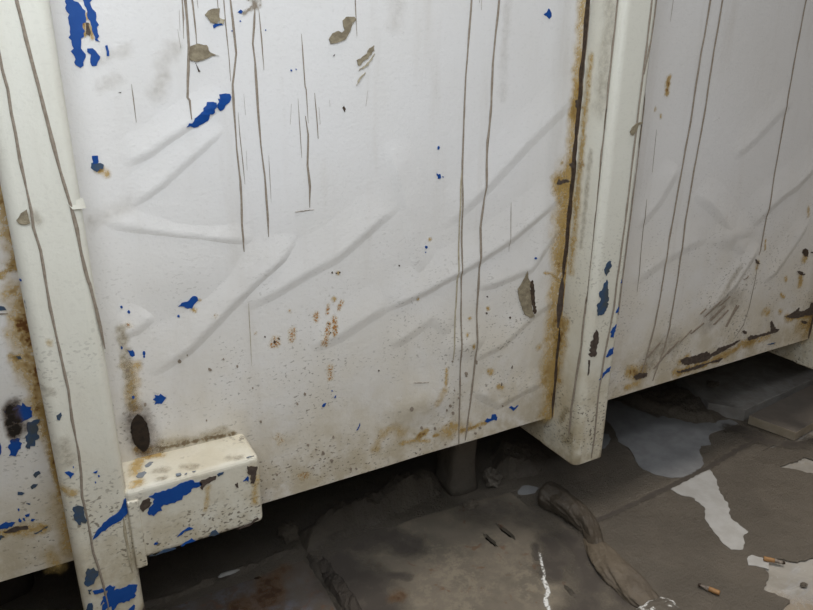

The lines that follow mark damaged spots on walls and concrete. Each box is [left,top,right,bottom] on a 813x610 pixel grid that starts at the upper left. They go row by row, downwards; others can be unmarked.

peeling [65,0,109,68]
peeling [187,93,231,128]
rust [0,185,17,279]
rust [544,56,593,417]
rust [314,297,343,346]
rust [673,340,754,376]
peeling [0,399,40,457]
rust [0,285,72,551]
rust [402,422,487,445]
peeling [140,470,224,516]
peeling [93,498,128,540]
peeling [84,568,137,610]